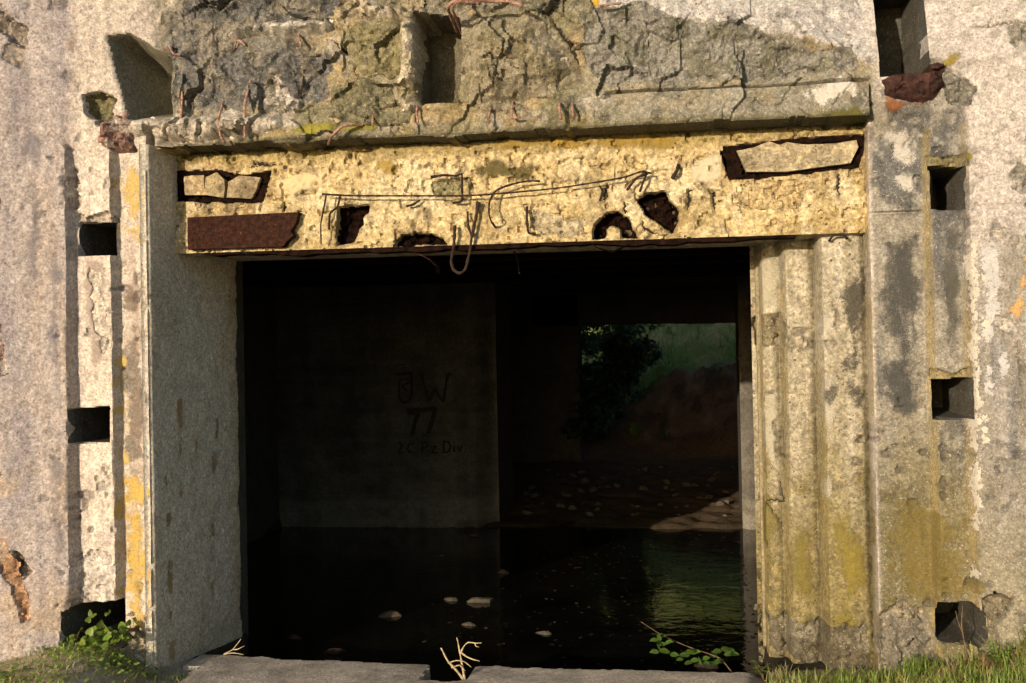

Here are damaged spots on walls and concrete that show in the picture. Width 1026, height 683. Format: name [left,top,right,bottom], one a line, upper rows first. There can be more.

corrosion [97,113,138,154]
spalling [166,0,374,146]
spalling [378,0,569,35]
spalling [581,1,859,87]
corrosion [879,62,946,121]
damp [760,215,971,585]